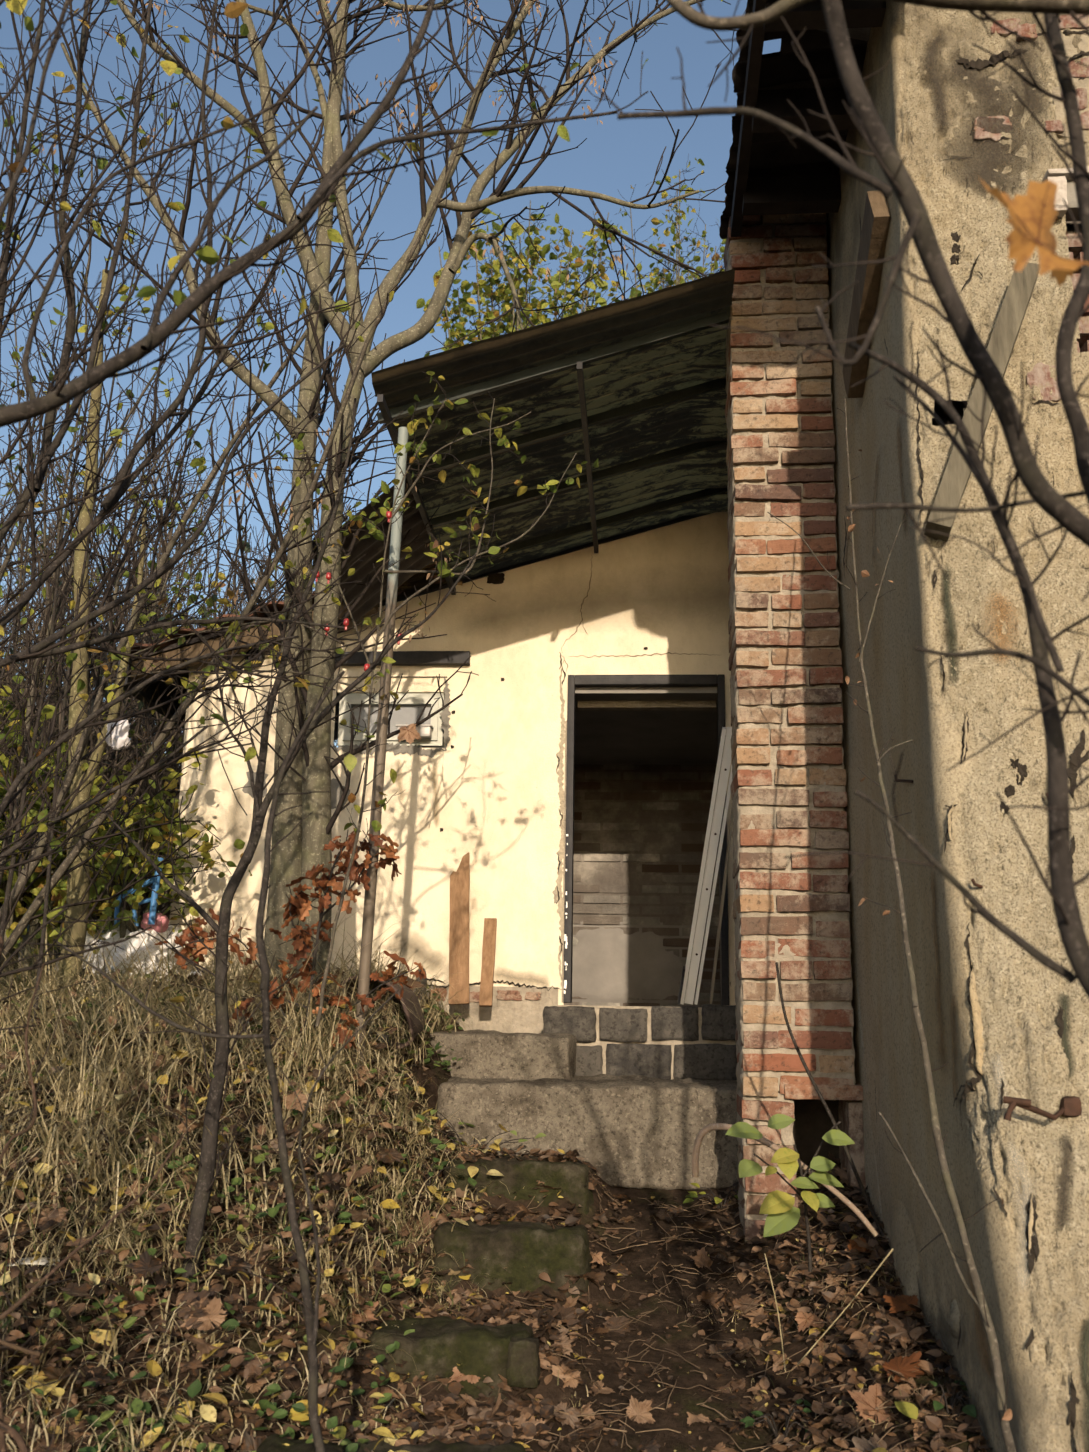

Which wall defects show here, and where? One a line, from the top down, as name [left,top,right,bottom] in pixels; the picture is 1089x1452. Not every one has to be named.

spalling [970,116,1012,142]
spalling [990,15,1089,143]